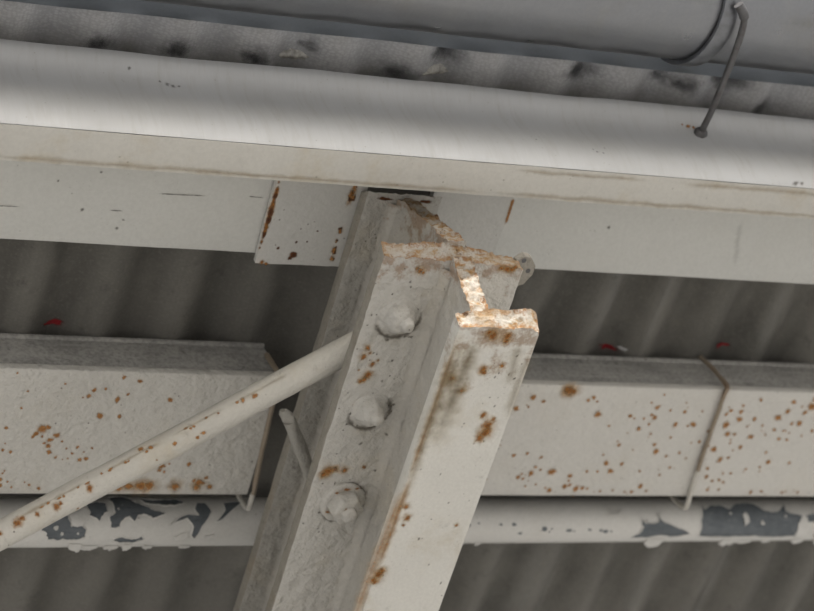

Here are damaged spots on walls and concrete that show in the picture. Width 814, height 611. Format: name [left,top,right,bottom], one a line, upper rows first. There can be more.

corrosion [259,181,280,249]
corrosion [32,425,93,461]
corrosion [477,413,495,441]
corrosion [691,400,814,462]
corrosion [116,482,153,491]
peeling [41,496,241,553]
peeling [629,502,814,548]